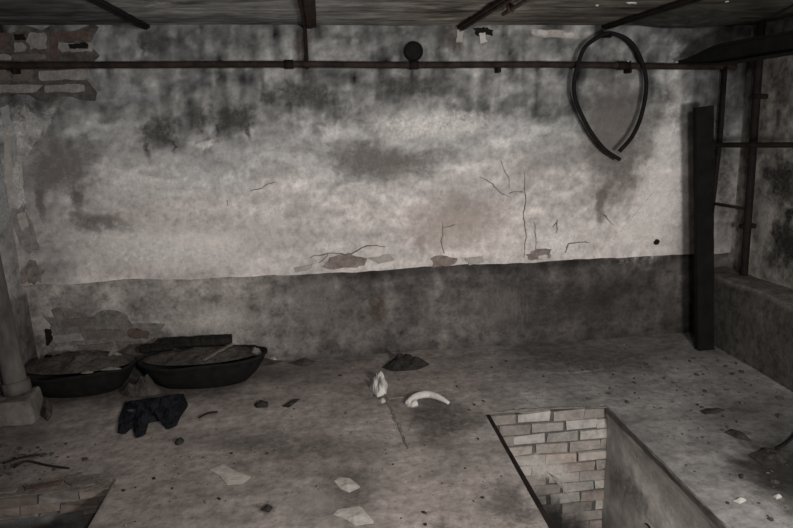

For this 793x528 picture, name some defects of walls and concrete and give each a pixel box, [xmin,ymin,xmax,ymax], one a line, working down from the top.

spalling [0,25,100,285]
leakage [0,109,192,231]
leakage [76,215,249,271]
peeling [294,253,394,272]
leakage [320,112,492,177]
crack [481,161,589,256]
leakage [534,230,585,255]
leakage [590,94,683,246]
leakage [758,161,793,265]